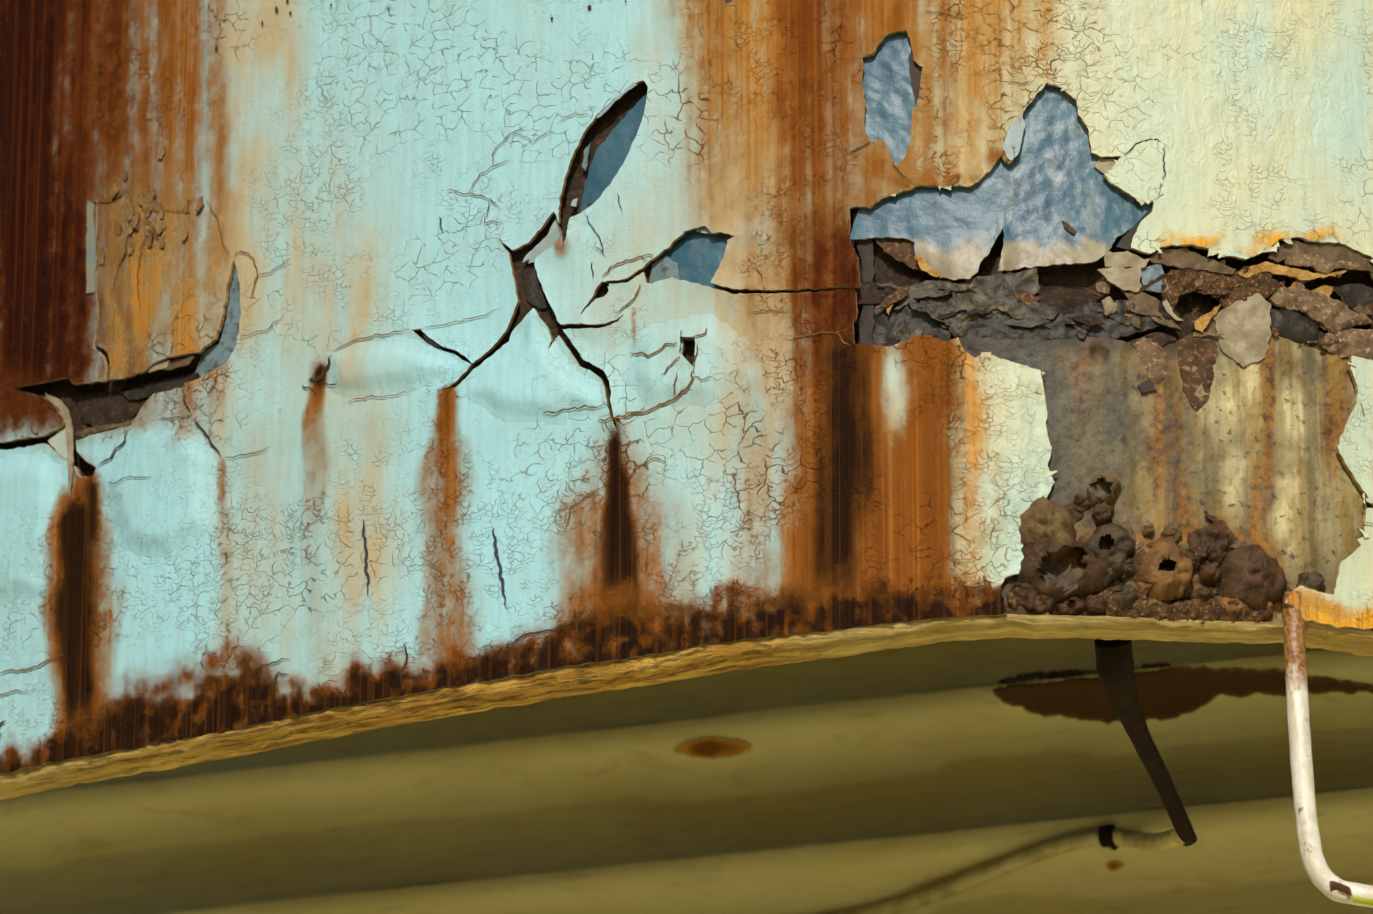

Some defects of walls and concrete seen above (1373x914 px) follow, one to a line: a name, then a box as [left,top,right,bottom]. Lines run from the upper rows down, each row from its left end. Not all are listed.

rust [0,0,230,441]
spalling [0,266,241,498]
spalling [561,82,648,215]
crack [750,267,849,345]
rust [671,0,1062,639]
peeling [862,32,922,166]
spalling [589,85,1373,624]
rust [38,463,124,733]
rust [415,381,474,665]
crack [568,487,602,521]
rust [554,415,696,620]
peeling [1134,662,1286,721]